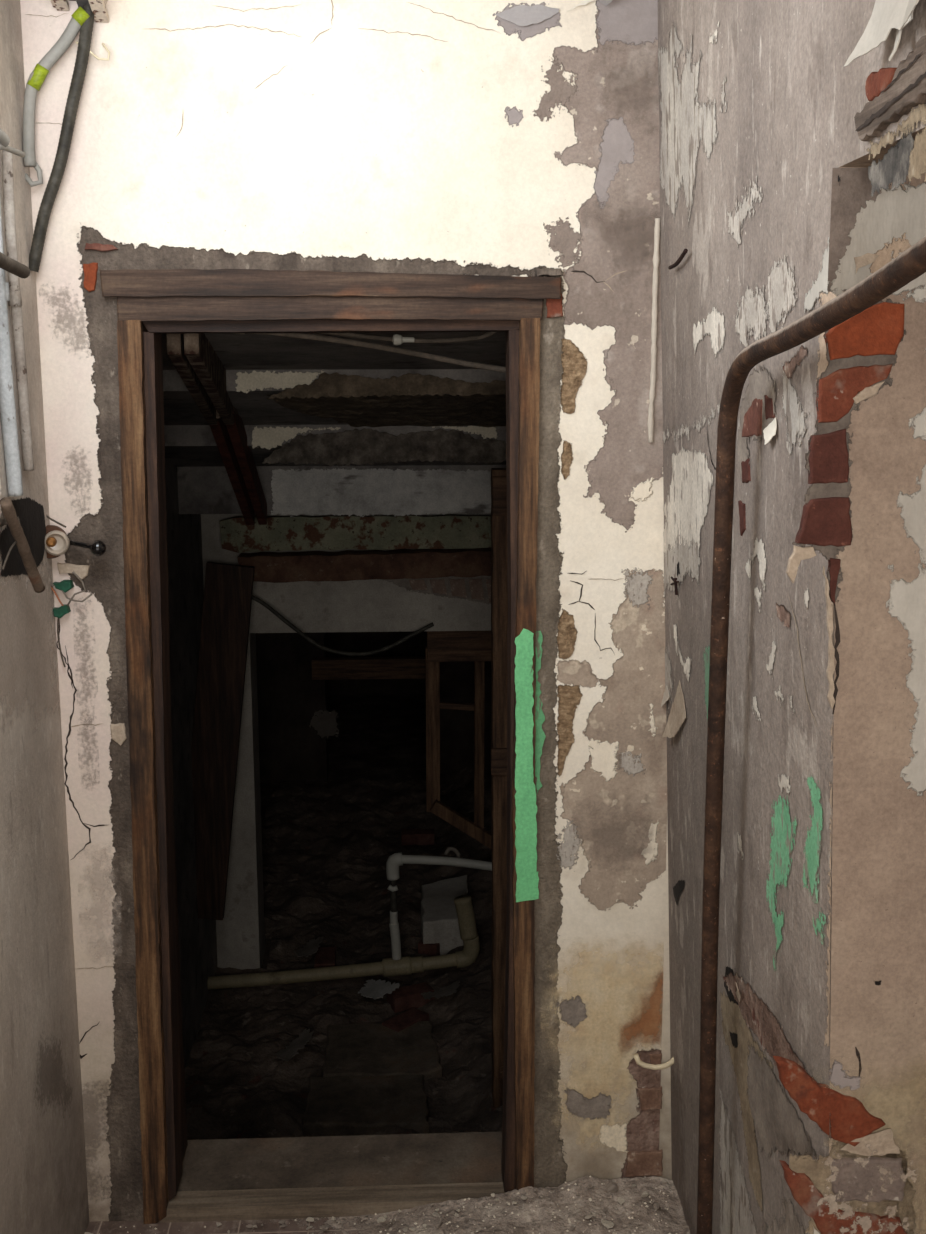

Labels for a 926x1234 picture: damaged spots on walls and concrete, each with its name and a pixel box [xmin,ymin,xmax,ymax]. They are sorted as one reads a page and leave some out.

crack [151,0,501,44]
peeling [804,104,926,313]
peeling [844,0,919,101]
crack [57,618,105,860]
peeling [0,0,686,1221]
flaking render [737,272,926,644]
peeling [886,464,926,796]
flaking render [723,782,919,1234]